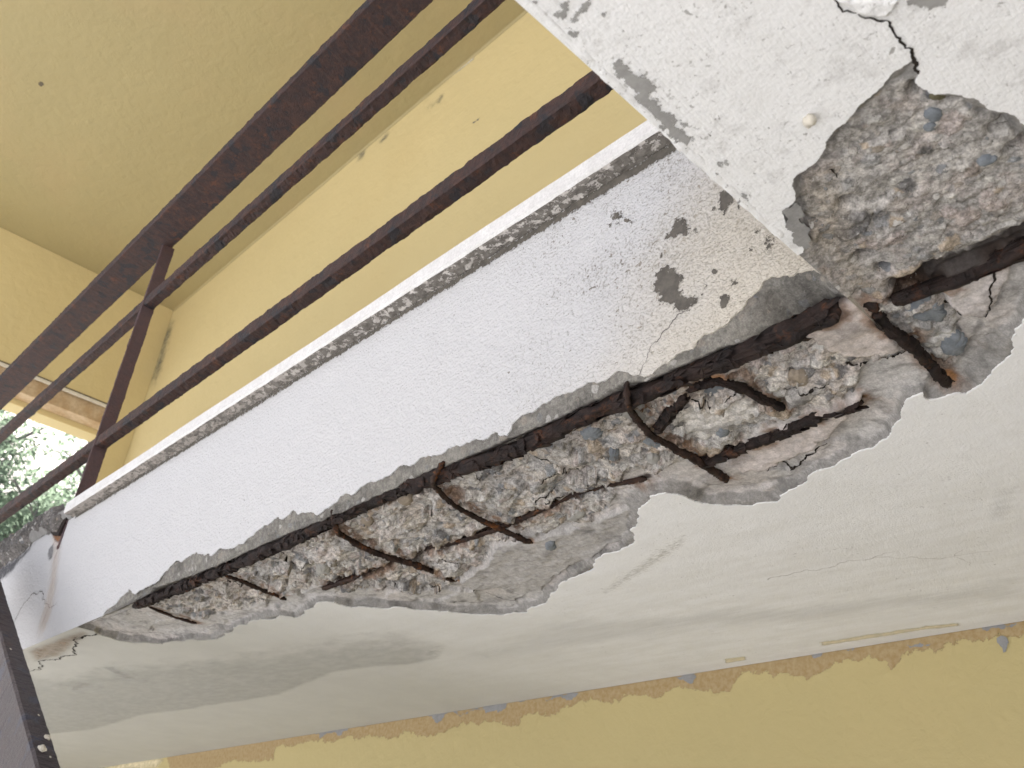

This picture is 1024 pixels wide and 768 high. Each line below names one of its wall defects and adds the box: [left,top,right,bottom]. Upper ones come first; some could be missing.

crack [834,0,920,74]
spalling [0,59,1024,644]
crack [32,634,97,671]
peeling [104,621,1024,768]